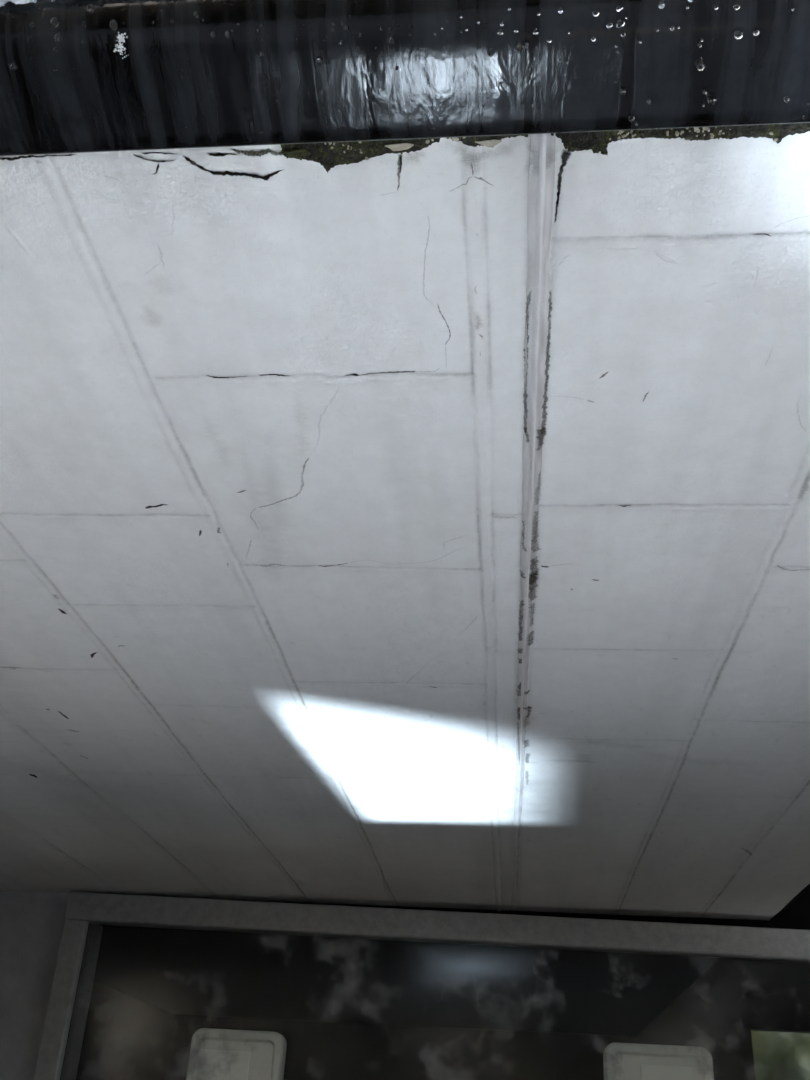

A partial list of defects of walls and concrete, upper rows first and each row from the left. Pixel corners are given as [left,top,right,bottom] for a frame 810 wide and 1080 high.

crack [134,148,286,180]
spalling [281,134,528,173]
spalling [551,123,810,156]
crack [207,372,288,380]
crack [346,369,415,377]
damp [523,291,552,450]
damp [518,515,539,663]